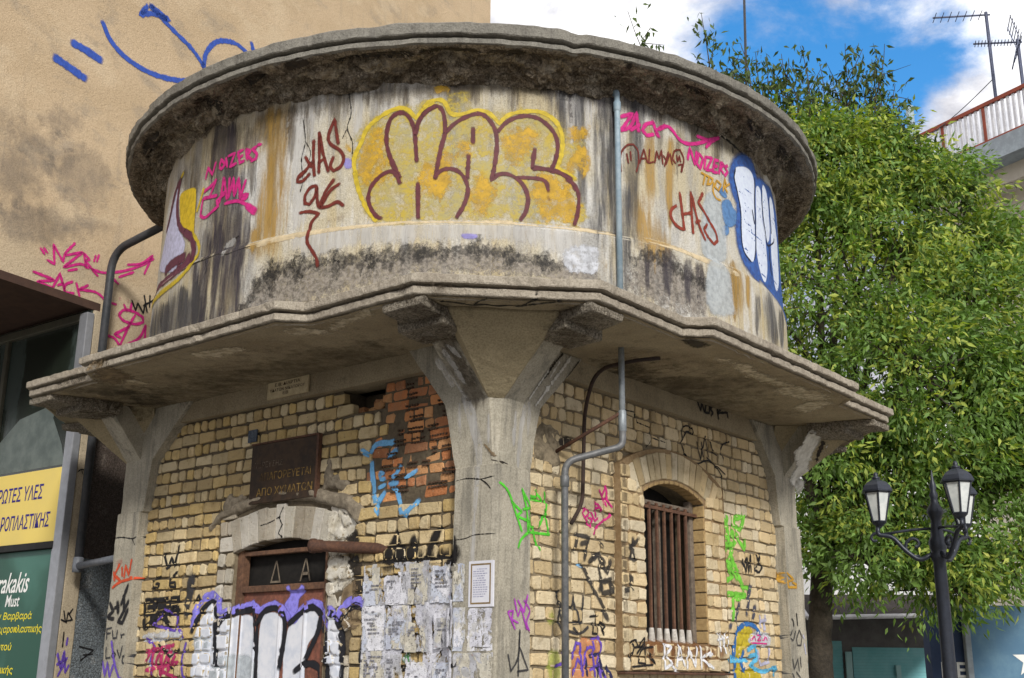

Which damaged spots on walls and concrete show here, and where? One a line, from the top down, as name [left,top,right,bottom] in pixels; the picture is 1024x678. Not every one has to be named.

spalling [244,47,528,100]
spalling [141,87,225,156]
crack [300,120,311,192]
crack [342,93,353,161]
leakage [149,108,600,337]
spalling [343,391,386,414]
flaking render [790,430,827,494]